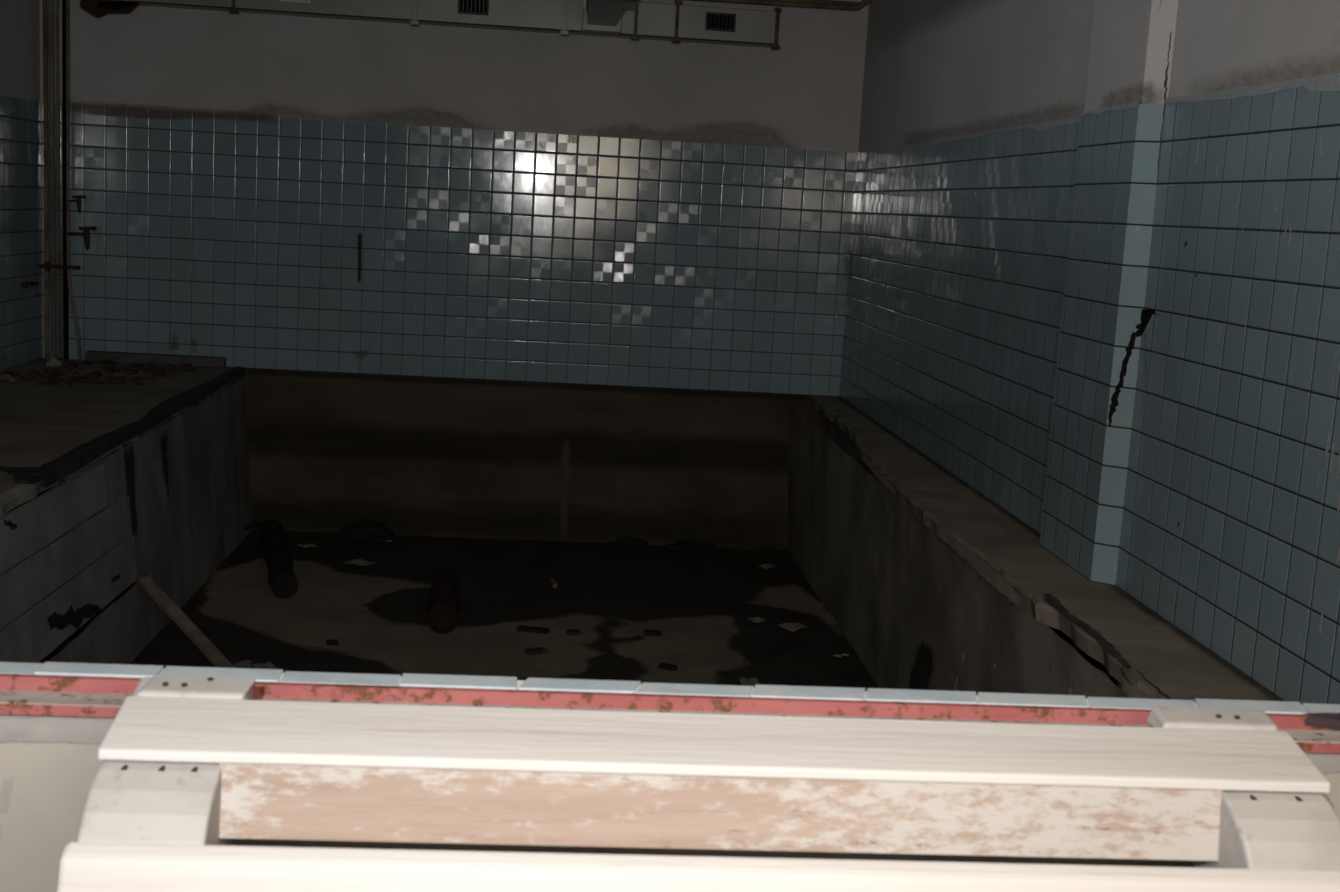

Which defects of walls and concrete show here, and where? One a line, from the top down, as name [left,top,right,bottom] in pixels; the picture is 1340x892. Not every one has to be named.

crack [1108,309,1160,427]